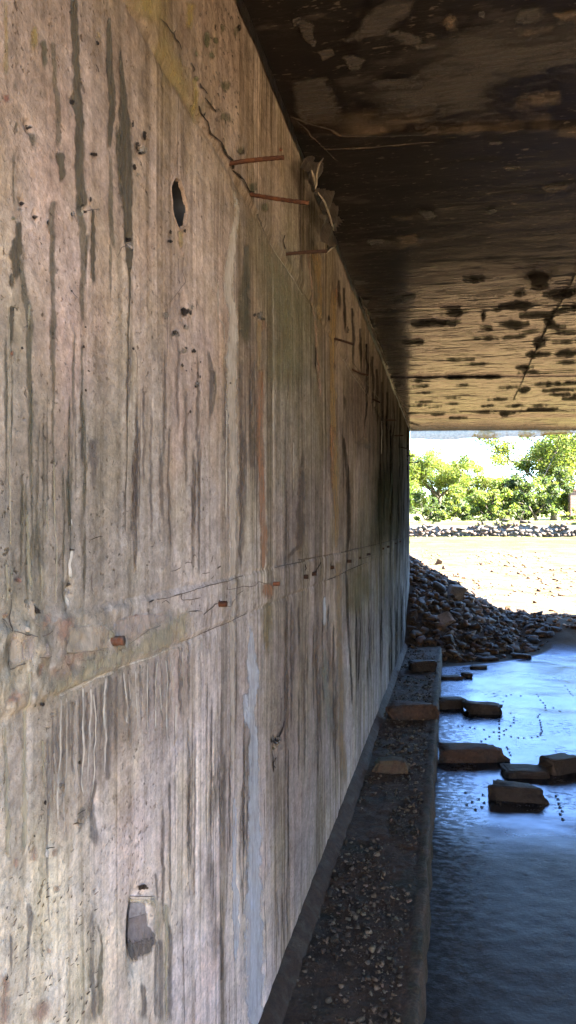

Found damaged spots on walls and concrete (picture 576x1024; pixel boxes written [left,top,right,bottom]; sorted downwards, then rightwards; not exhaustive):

peeling [292,0,576,136]
crack [160,18,303,294]
damp [338,274,576,525]
crack [365,274,576,413]
damp [41,0,288,1024]
crack [3,536,408,670]
corrosion [263,584,273,648]
damp [4,673,31,854]
spalling [106,819,159,962]